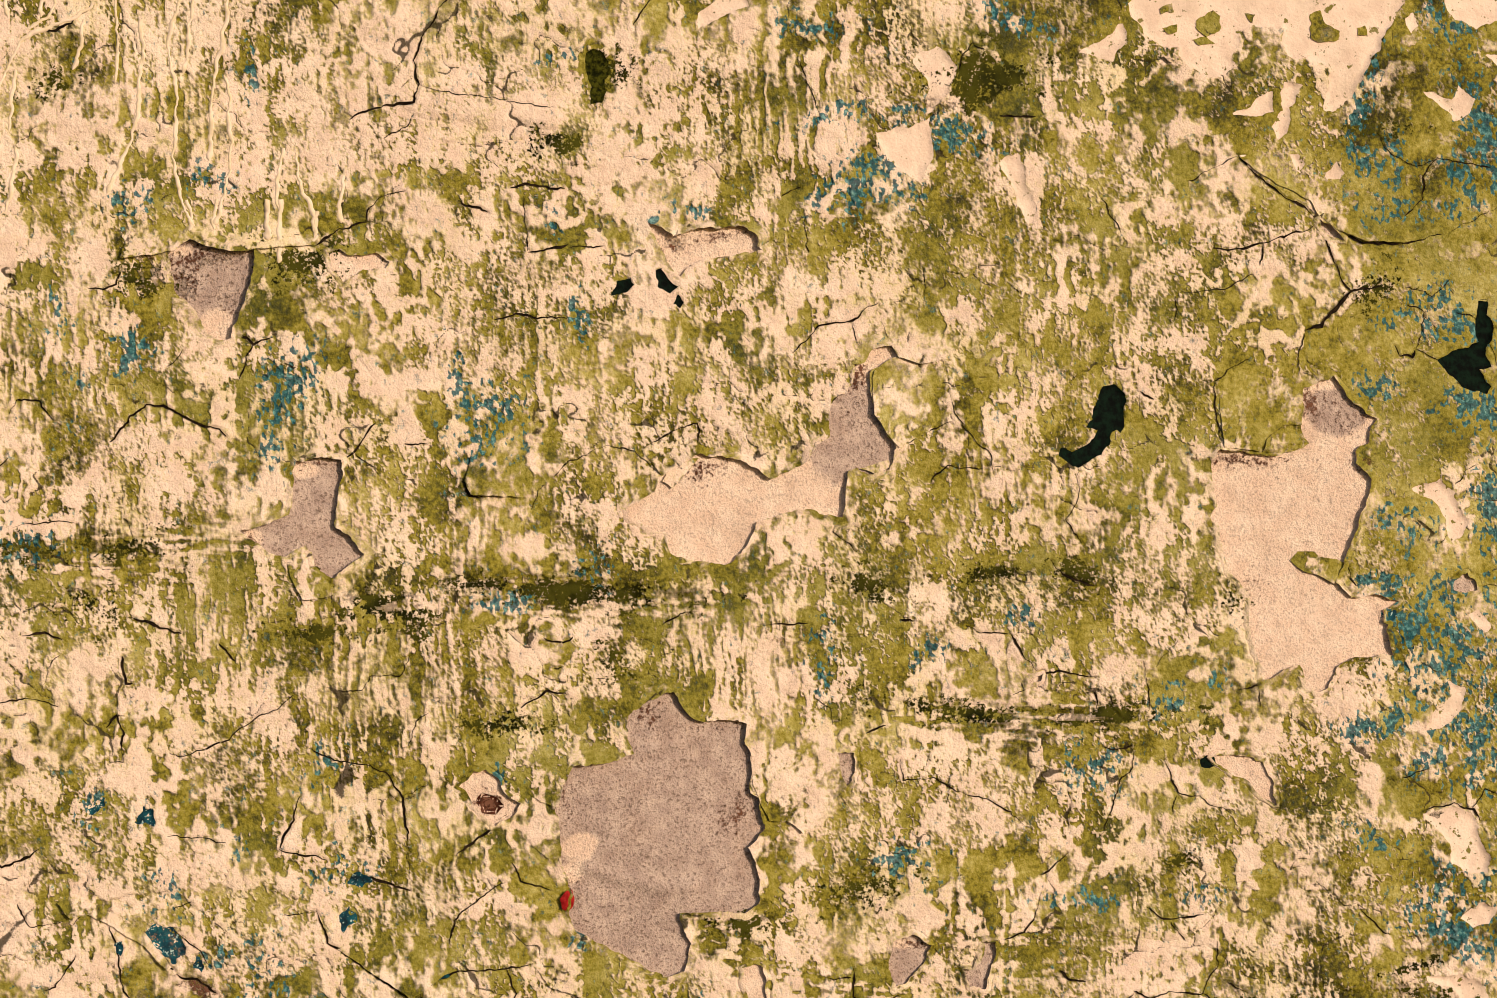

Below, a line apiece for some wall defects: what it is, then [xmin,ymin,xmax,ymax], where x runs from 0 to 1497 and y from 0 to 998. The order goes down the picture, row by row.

peeling [1079,0,1418,112]
peeling [120,226,397,349]
peeling [639,214,776,308]
crack [1174,135,1497,367]
peeling [1438,301,1494,394]
peeling [615,306,963,578]
peeling [1059,384,1126,468]
peeling [232,447,376,600]
peeling [1202,361,1406,698]
crack [456,808,516,856]
peeling [453,678,860,998]
crack [282,863,550,998]